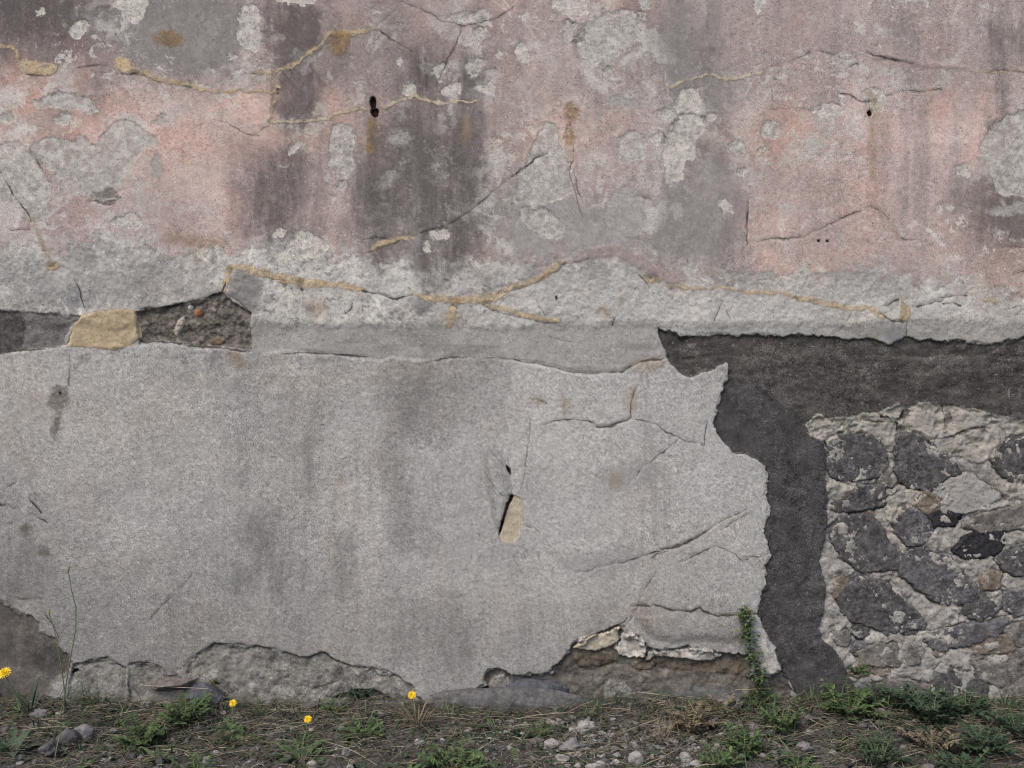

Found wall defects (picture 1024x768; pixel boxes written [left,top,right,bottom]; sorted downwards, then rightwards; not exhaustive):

crack [380,1,509,86]
crack [364,153,547,253]
crack [746,207,915,241]
peeling [979,111,1024,217]
spalling [0,310,80,354]
spalling [136,292,252,349]
crack [284,350,368,358]
crack [346,290,412,313]
crack [426,356,708,495]
flaking render [482,329,1024,703]
crack [574,509,767,670]
spalling [0,602,423,704]